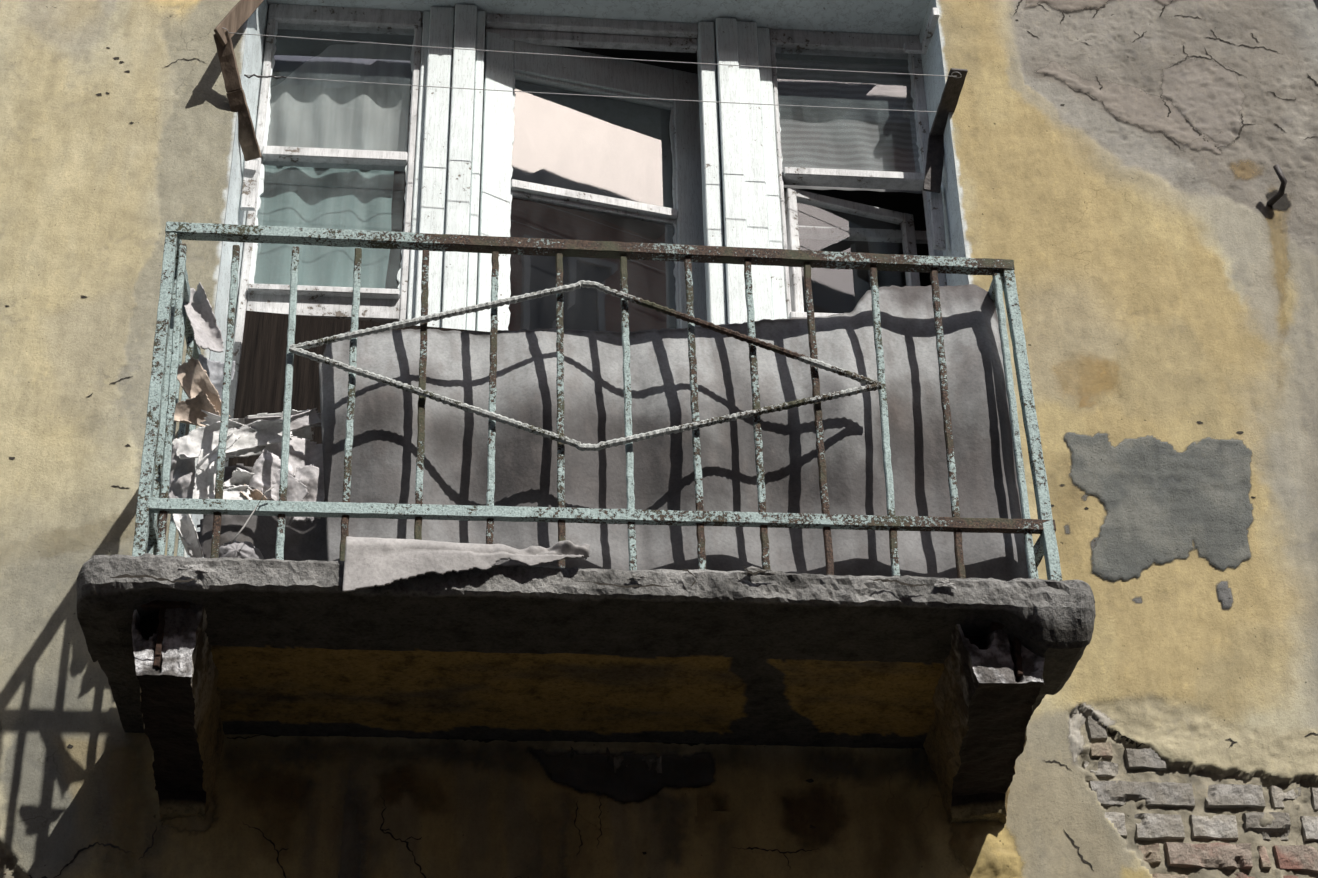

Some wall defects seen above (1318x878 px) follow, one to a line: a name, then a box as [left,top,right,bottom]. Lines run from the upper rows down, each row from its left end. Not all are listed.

crack [1014,0,1105,46]
peeling [1036,57,1245,154]
crack [1070,5,1318,151]
flaking render [1266,190,1291,211]
crack [380,797,426,878]
flaking render [1082,716,1318,878]